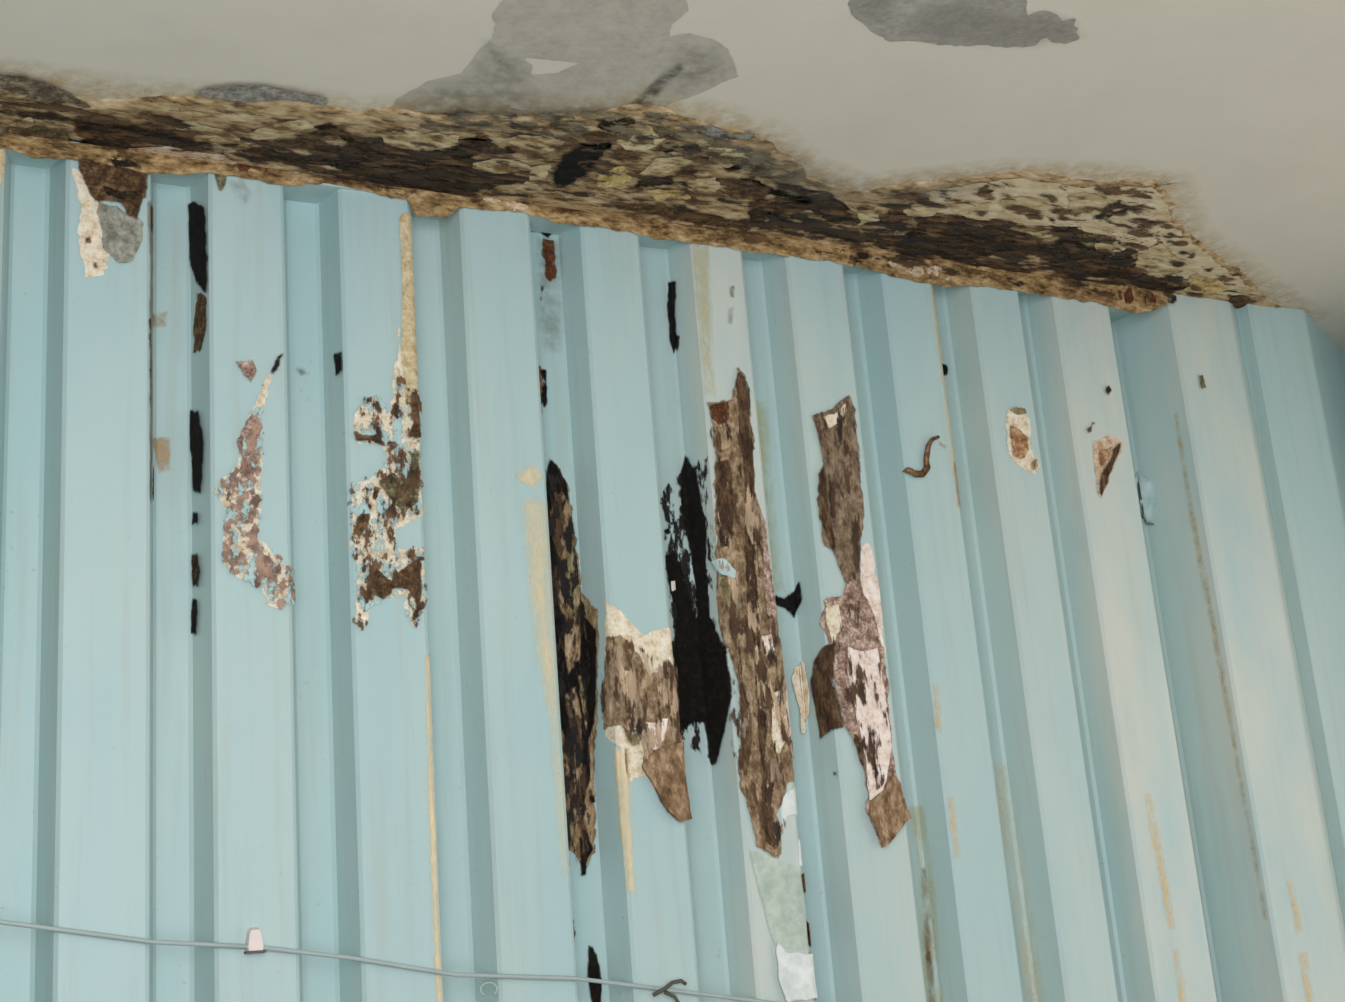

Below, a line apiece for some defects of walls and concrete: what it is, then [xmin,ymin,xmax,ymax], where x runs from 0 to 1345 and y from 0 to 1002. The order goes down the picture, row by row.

spalling [0,0,1282,309]
peeling [214,354,296,609]
peeling [347,212,428,630]
peeling [1005,407,1041,475]
peeling [1087,422,1123,498]
peeling [600,601,692,822]
peeling [707,367,912,1002]